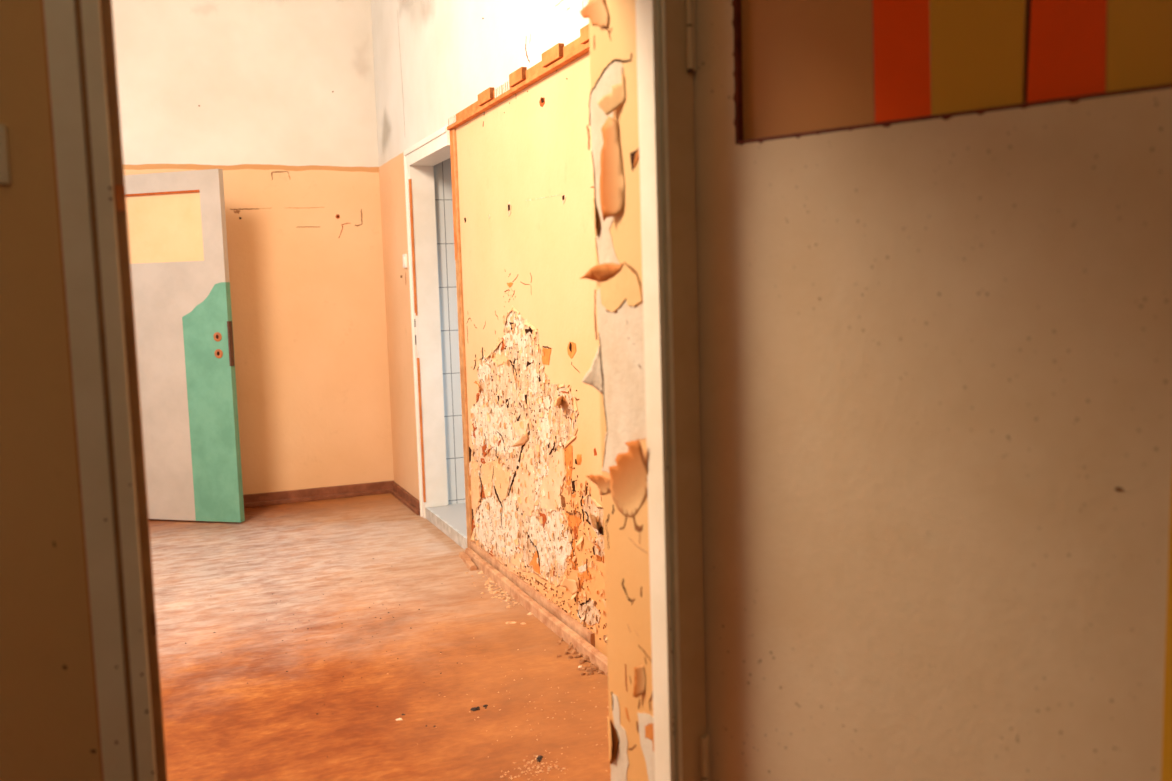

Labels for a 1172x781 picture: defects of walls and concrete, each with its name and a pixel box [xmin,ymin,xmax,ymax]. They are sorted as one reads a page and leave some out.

peeling [580,0,612,50]
peeling [469,53,646,643]
peeling [608,692,655,781]